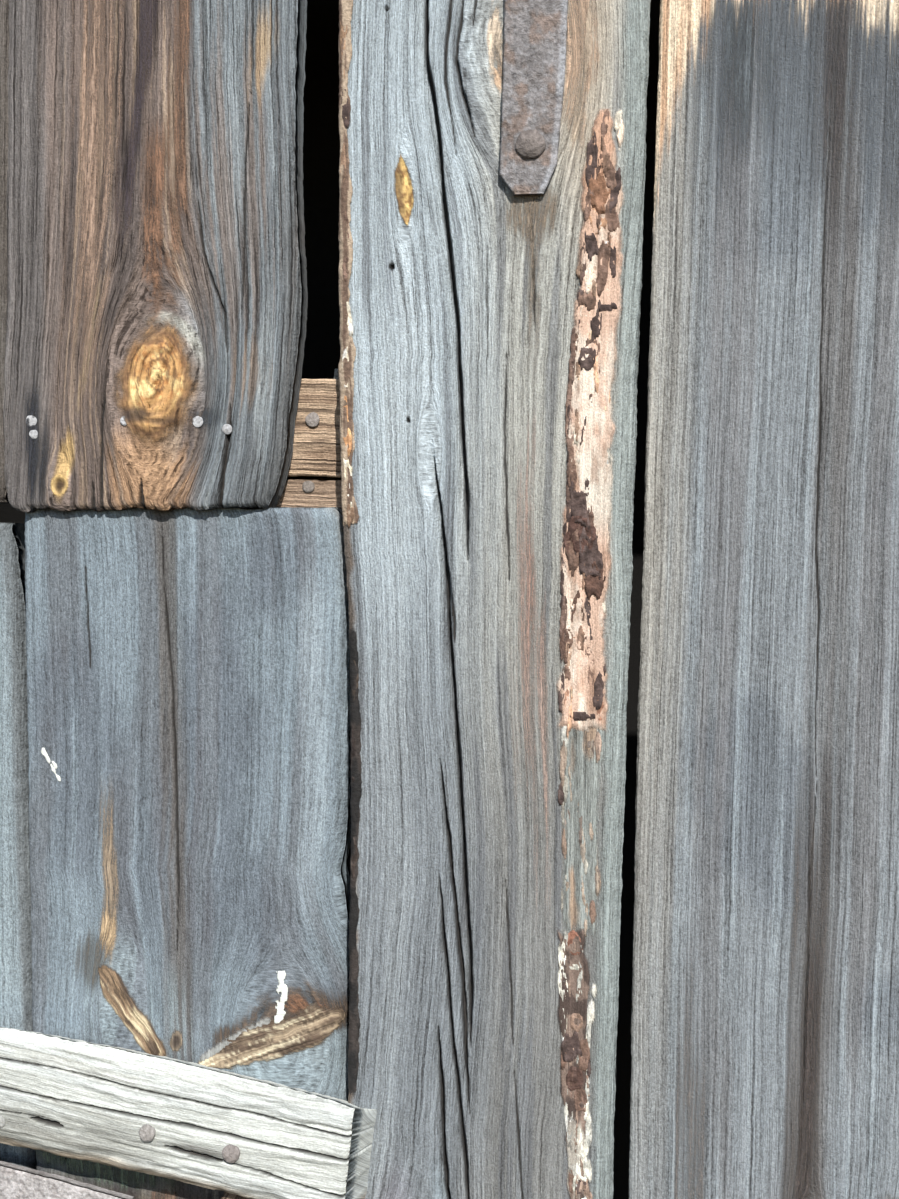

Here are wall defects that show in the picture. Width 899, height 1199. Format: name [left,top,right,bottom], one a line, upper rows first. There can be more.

crack [425,0,477,1199]
rust [487,10,503,89]
peeling [558,109,624,1199]
water stain [701,0,899,208]